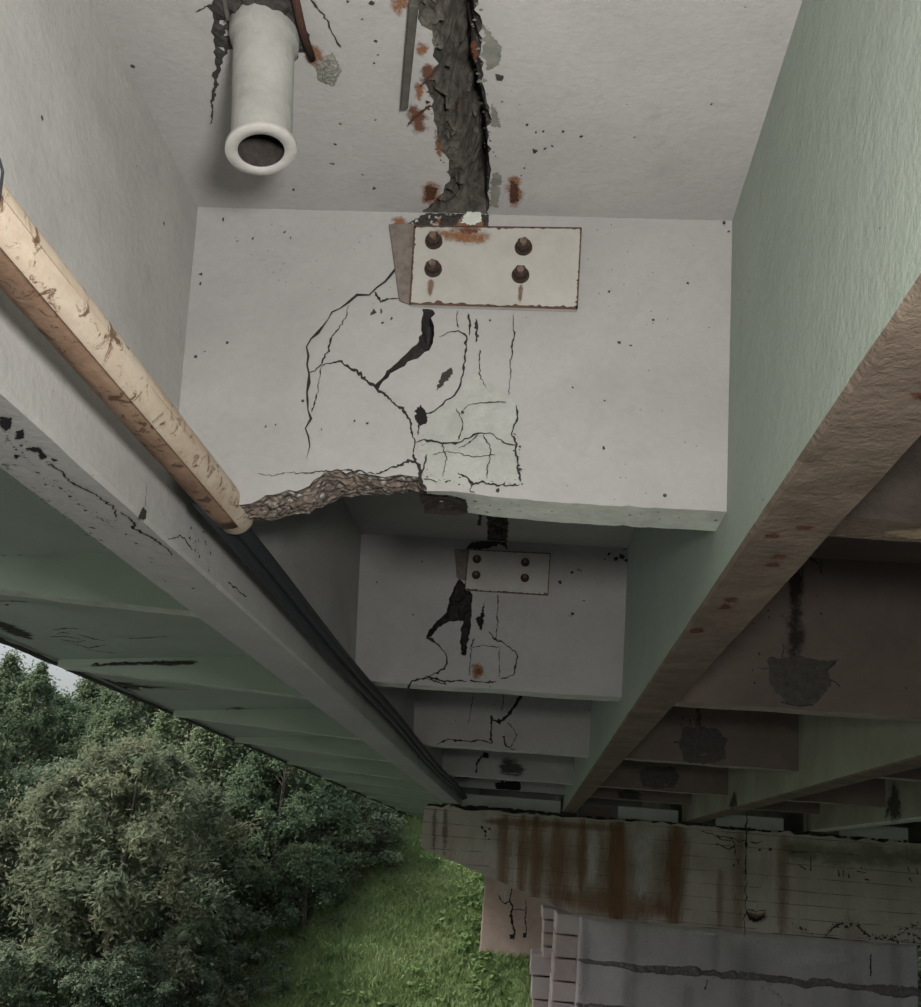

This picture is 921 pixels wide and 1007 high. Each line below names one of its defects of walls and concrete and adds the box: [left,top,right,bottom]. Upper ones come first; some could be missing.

spalling [196,0,310,123]
rust [409,43,442,157]
spalling [407,0,504,226]
crack [257,268,520,494]
spalling [239,470,509,550]
crack [405,579,524,779]
crack [499,889,527,940]
rust [489,816,683,920]
crack [701,813,772,937]